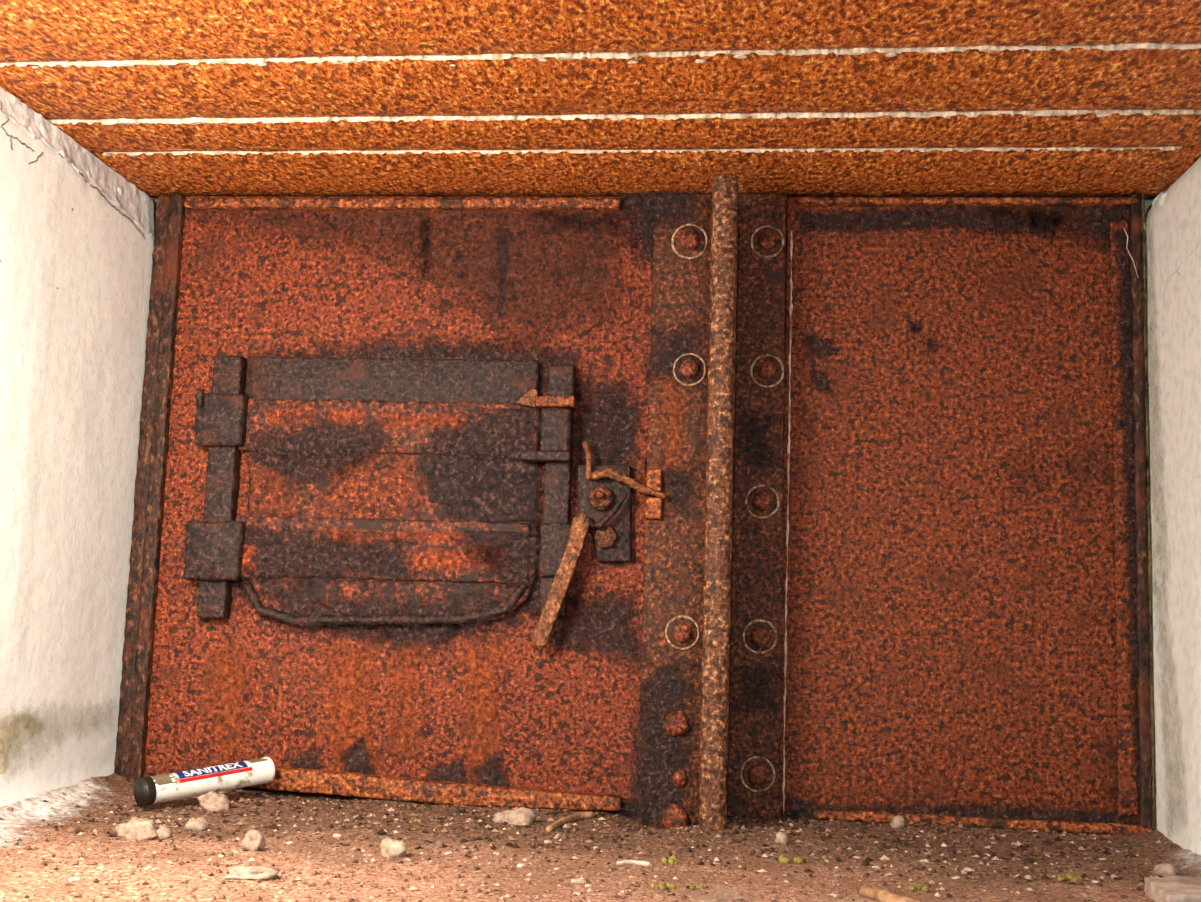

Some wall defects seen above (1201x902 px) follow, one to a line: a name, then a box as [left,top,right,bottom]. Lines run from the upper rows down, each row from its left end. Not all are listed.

rust [537,191,703,264]
rust [648,326,705,382]
rust [232,336,638,654]
rust [796,206,1156,797]
rust [550,571,695,828]
damp [0,715,43,773]
rust [291,747,322,769]
rust [339,737,373,775]
rust [427,751,508,787]
damp [0,781,107,845]
rust [787,795,1139,824]